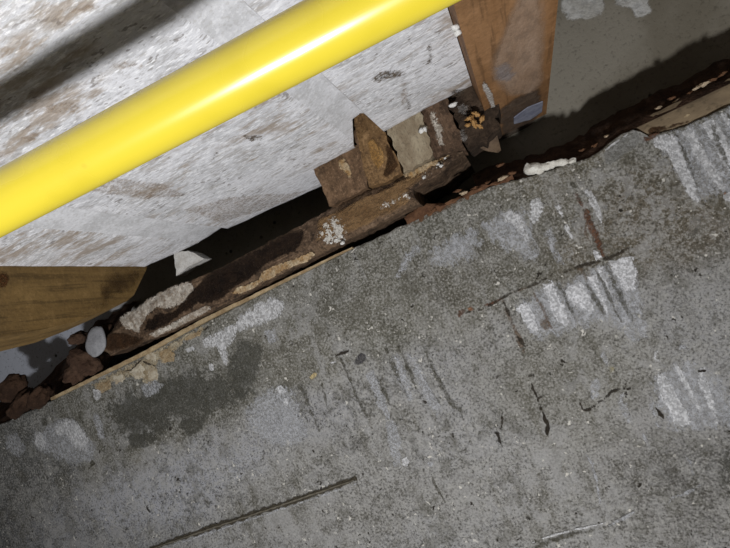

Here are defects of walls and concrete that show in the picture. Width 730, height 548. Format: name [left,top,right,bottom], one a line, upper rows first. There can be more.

corrosion [575,194,604,257]
crack [465,248,629,314]
leakage [107,297,320,447]
leakage [366,370,409,467]
leakage [385,346,462,412]
crack [528,375,550,436]
crack [579,388,631,412]